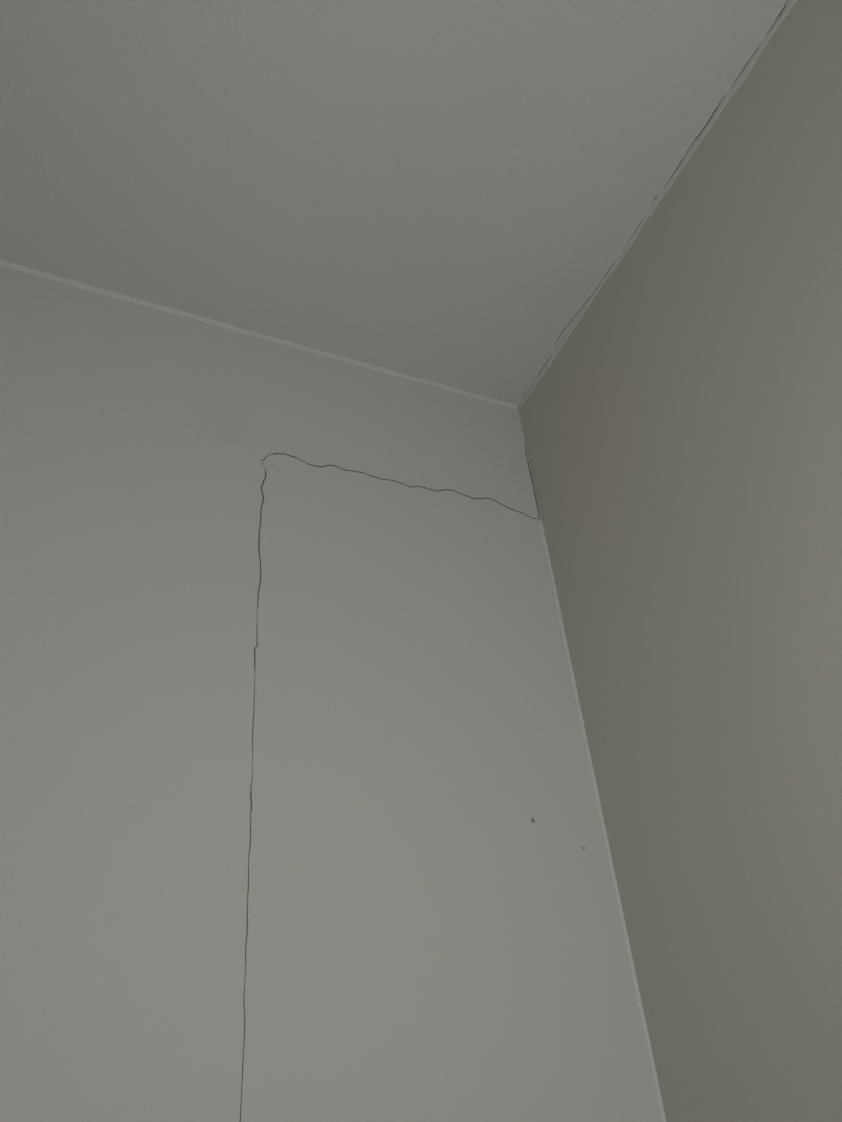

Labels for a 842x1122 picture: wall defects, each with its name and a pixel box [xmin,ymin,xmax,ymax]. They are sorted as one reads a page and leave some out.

crack [237,442,541,1122]